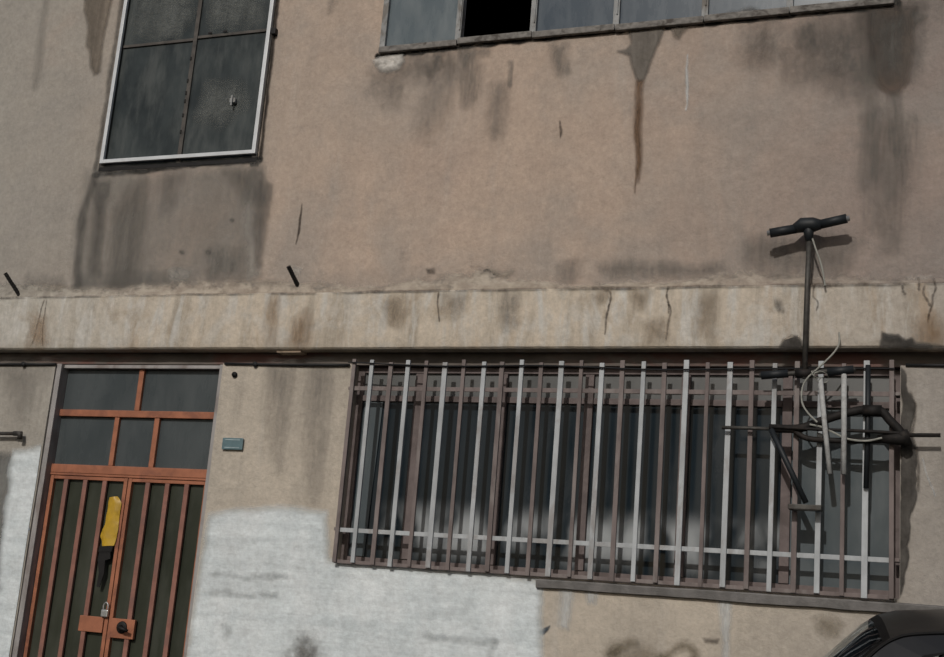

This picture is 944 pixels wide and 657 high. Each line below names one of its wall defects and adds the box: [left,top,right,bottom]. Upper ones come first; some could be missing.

leakage [84,0,111,73]
crack [344,290,439,302]
crack [567,285,744,327]
crack [777,278,935,320]